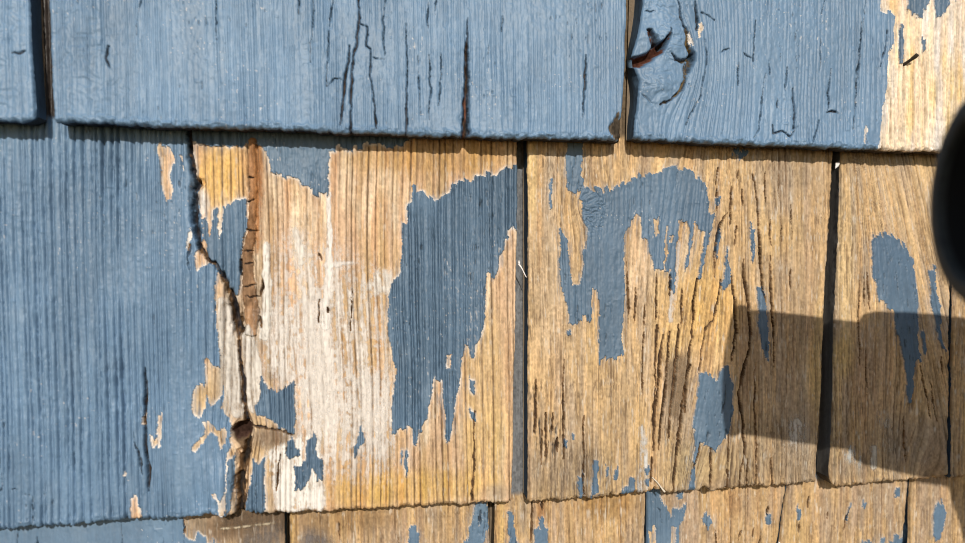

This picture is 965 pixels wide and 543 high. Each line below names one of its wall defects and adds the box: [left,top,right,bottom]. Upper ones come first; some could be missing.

spalling [157,143,184,201]
crack [186,130,293,509]
crack [298,0,470,139]
peeling [183,130,645,543]
crack [626,167,793,510]
peeling [526,0,965,543]
crack [646,0,887,141]
crack [715,507,769,543]